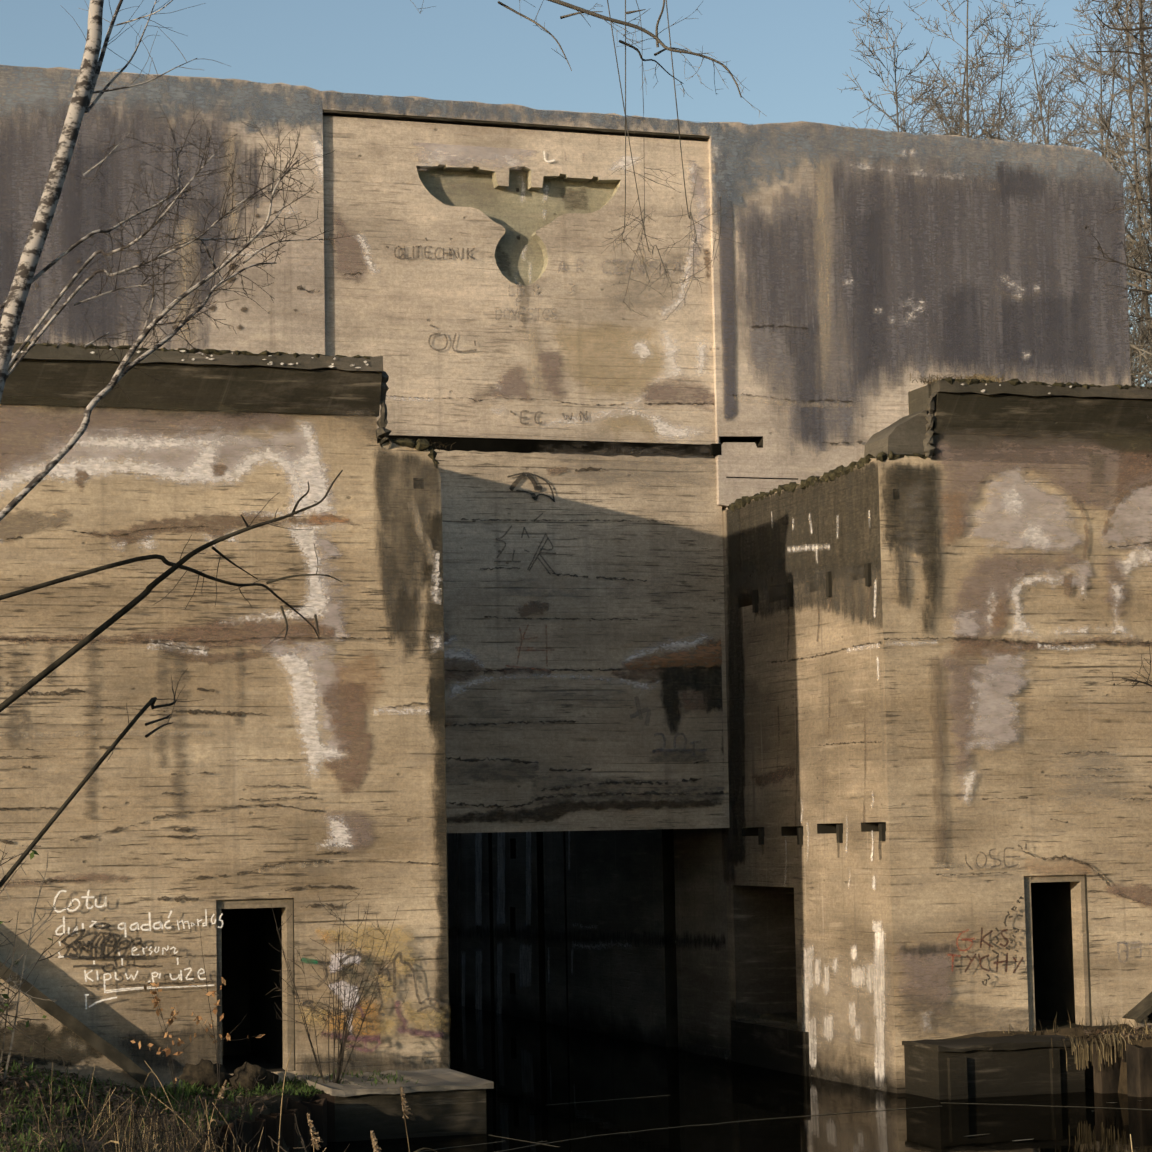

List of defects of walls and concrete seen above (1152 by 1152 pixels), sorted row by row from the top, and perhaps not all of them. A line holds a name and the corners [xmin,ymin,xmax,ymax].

leakage [0,65,78,322]
leakage [17,73,576,349]
leakage [499,334,562,400]
leakage [549,113,1131,451]
leakage [0,396,349,637]
leakage [280,645,371,792]
leakage [301,410,732,1074]
leakage [660,429,1152,882]
leakage [123,1028,221,1072]
leakage [730,923,1029,1092]